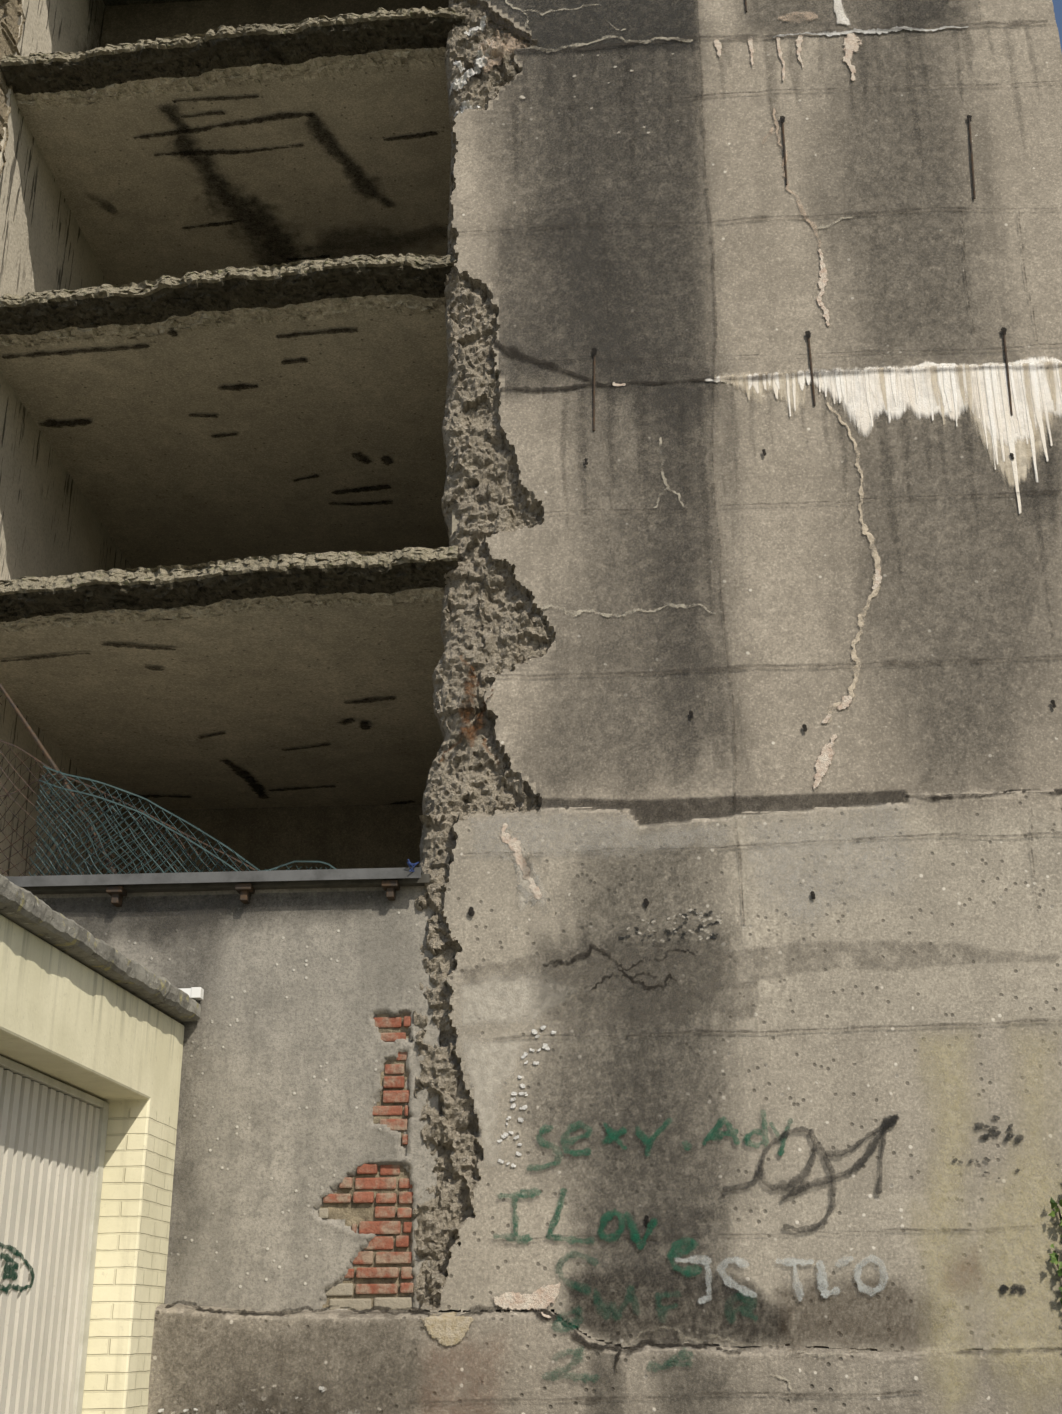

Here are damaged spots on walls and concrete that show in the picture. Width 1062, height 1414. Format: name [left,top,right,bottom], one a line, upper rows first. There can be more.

crack [477,0,625,47]
leakage [161,106,446,266]
leakage [485,0,706,783]
leakage [705,0,1062,758]
spalling [0,0,561,1347]
crack [541,604,710,617]
crack [813,402,882,789]
crack [543,909,722,991]
crack [165,1301,741,1373]